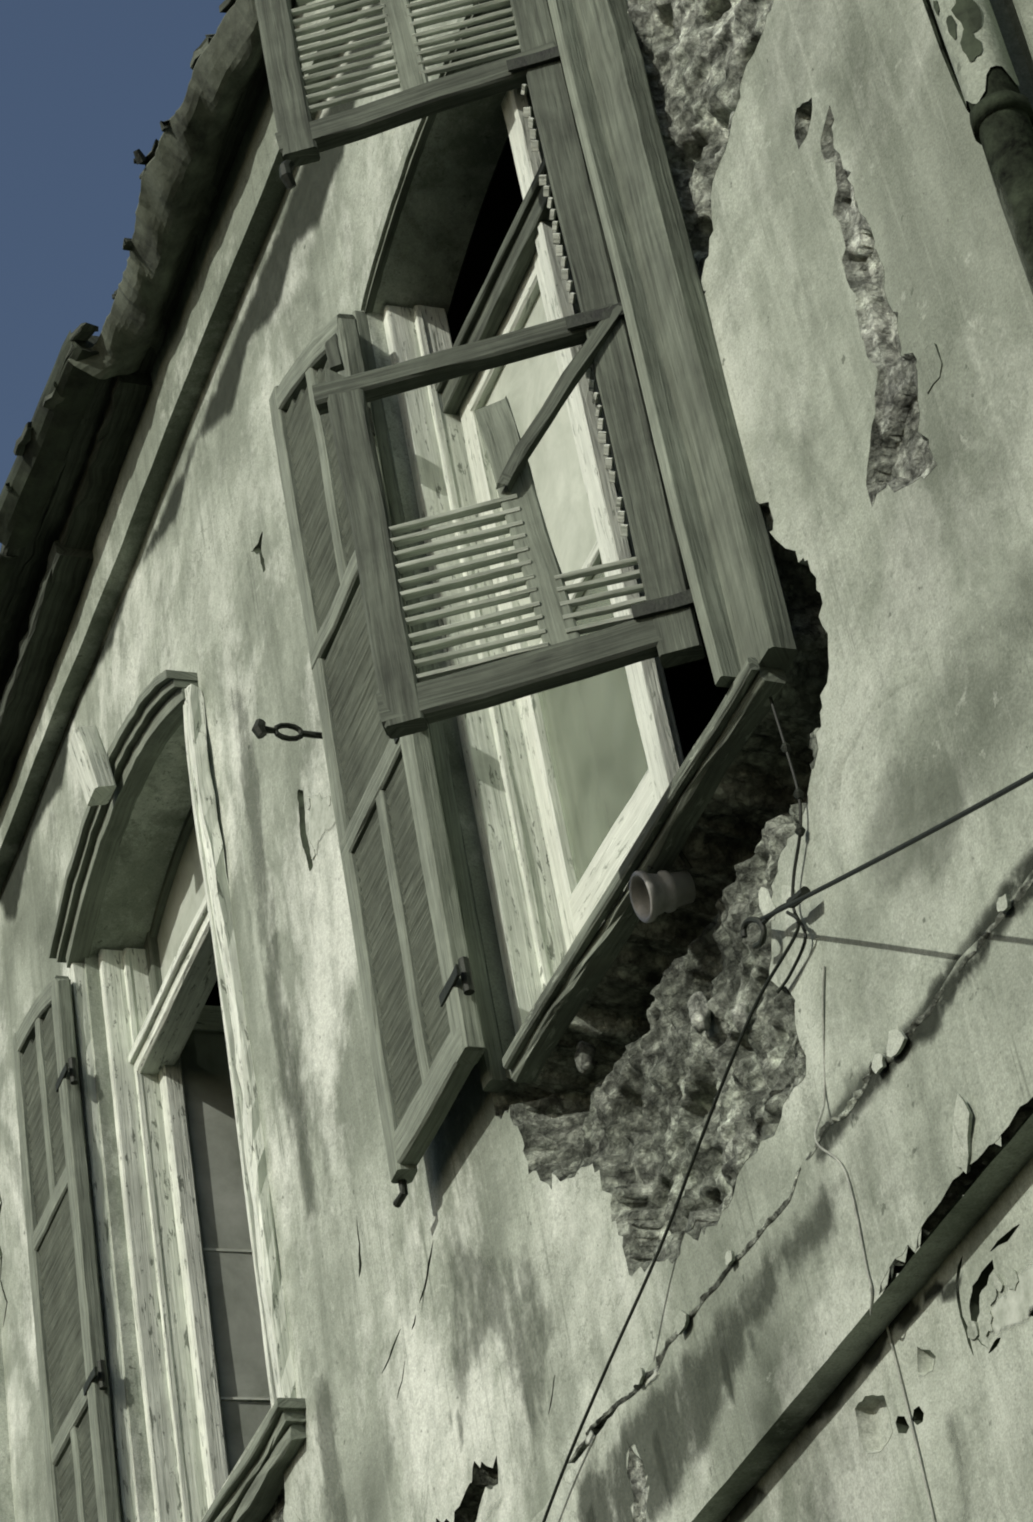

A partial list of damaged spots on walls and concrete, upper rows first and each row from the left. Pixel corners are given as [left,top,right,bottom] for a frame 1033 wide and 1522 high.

flaking render [626,0,773,294]
flaking render [794,97,943,506]
flaking render [491,502,829,1276]
leakage [818,851,1033,1157]
flaking render [879,1094,1033,1294]
crack [956,1224,1020,1355]
peeling [967,1265,1033,1339]
spalling [436,1455,501,1522]
flaking render [855,1395,893,1454]